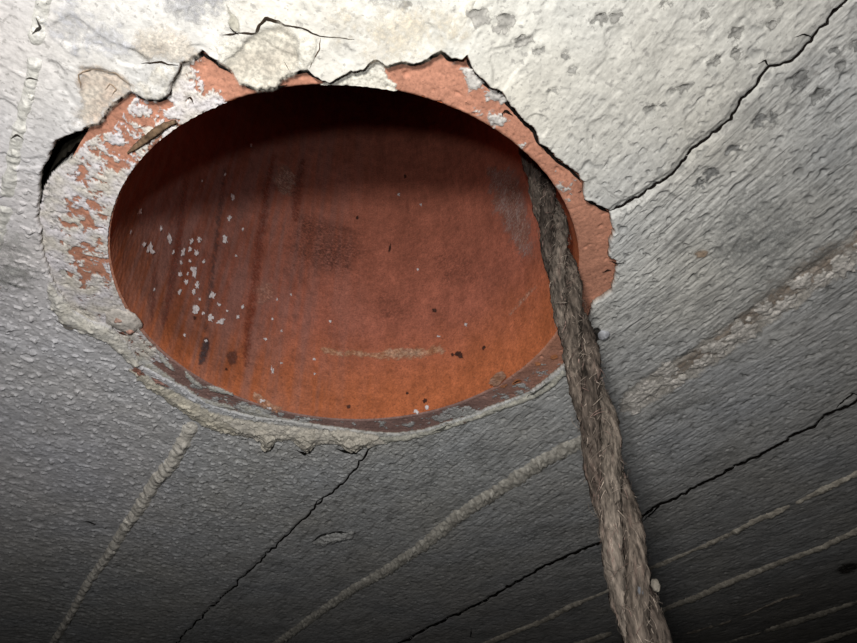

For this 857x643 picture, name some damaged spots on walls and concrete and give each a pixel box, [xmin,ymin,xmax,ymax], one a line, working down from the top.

spalling [215,10,317,88]
peeling [321,60,397,91]
peeling [459,67,507,128]
hole [590,12,623,26]
crack [384,0,848,213]
hole [707,26,744,67]
peeling [38,29,321,423]
peeling [374,406,482,429]
crack [642,393,857,522]
crack [176,448,371,643]
crack [398,542,602,643]